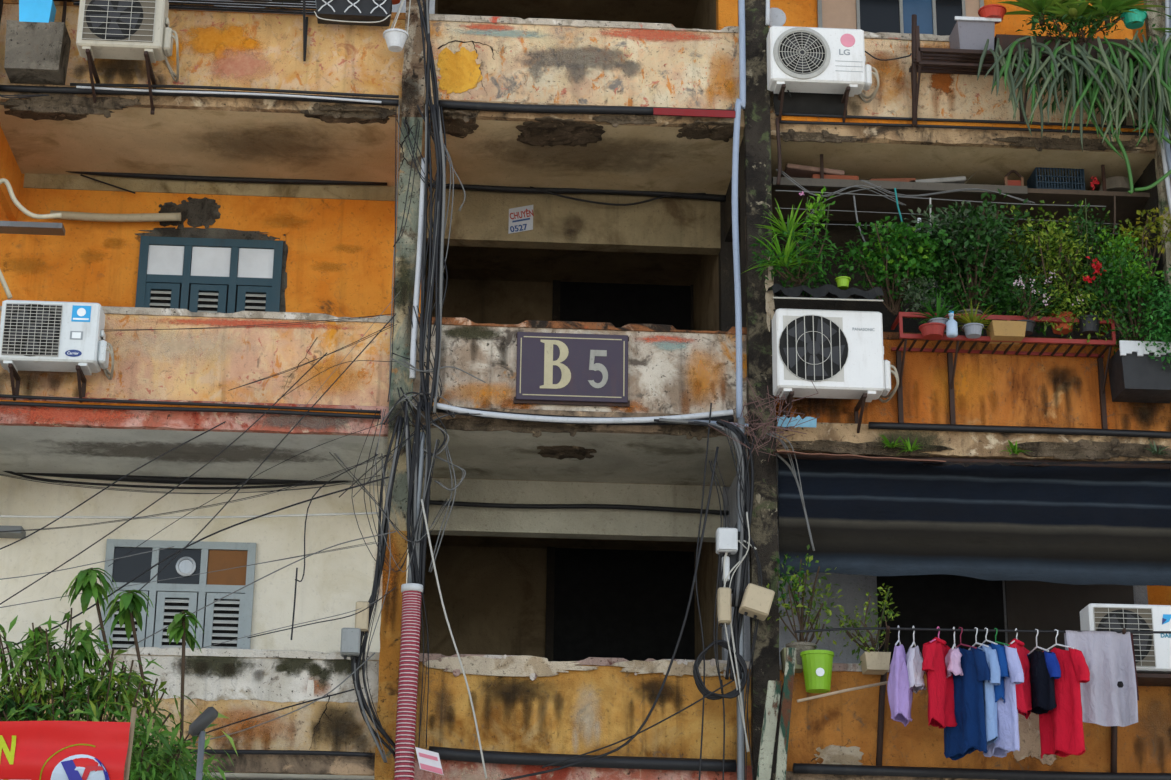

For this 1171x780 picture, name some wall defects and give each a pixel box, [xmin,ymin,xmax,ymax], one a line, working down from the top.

peeling [437,47,483,94]
leakage [567,64,586,82]
spalling [0,93,141,118]
spalling [300,103,396,124]
leakage [1044,369,1079,403]
spalling [430,417,595,450]
leakage [309,664,331,686]
spalling [422,654,730,681]
leakage [486,681,543,718]
leakage [643,680,679,704]